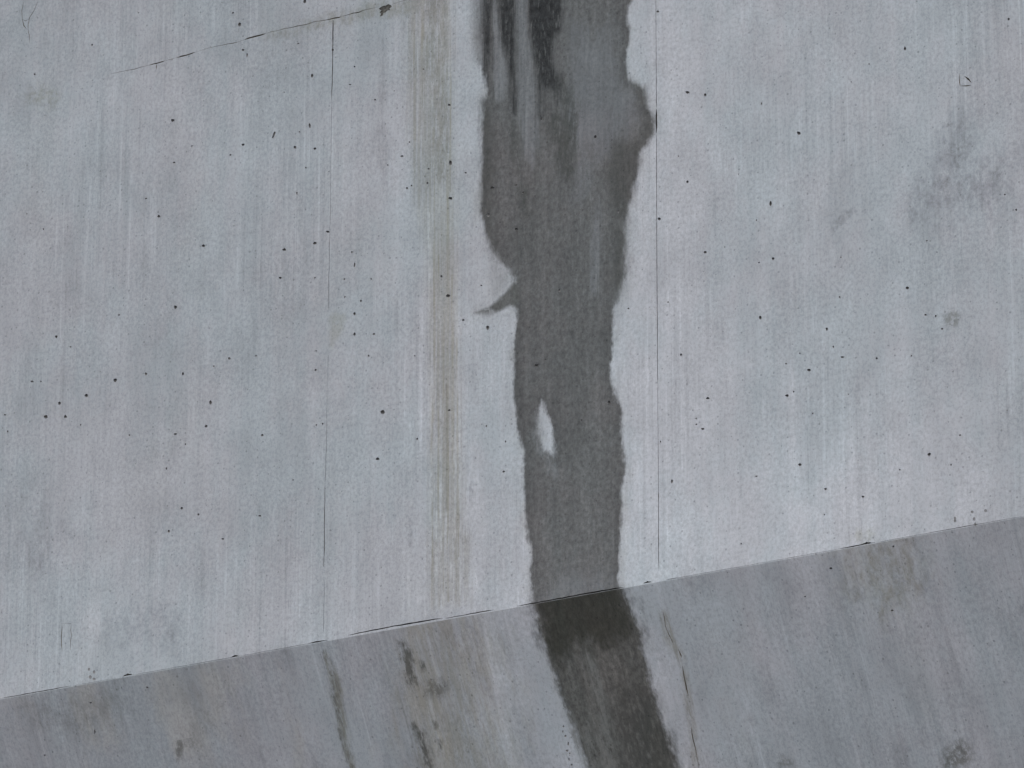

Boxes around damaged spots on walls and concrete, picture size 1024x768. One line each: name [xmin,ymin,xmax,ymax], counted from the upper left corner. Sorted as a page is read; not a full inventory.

damp [244,0,694,768]